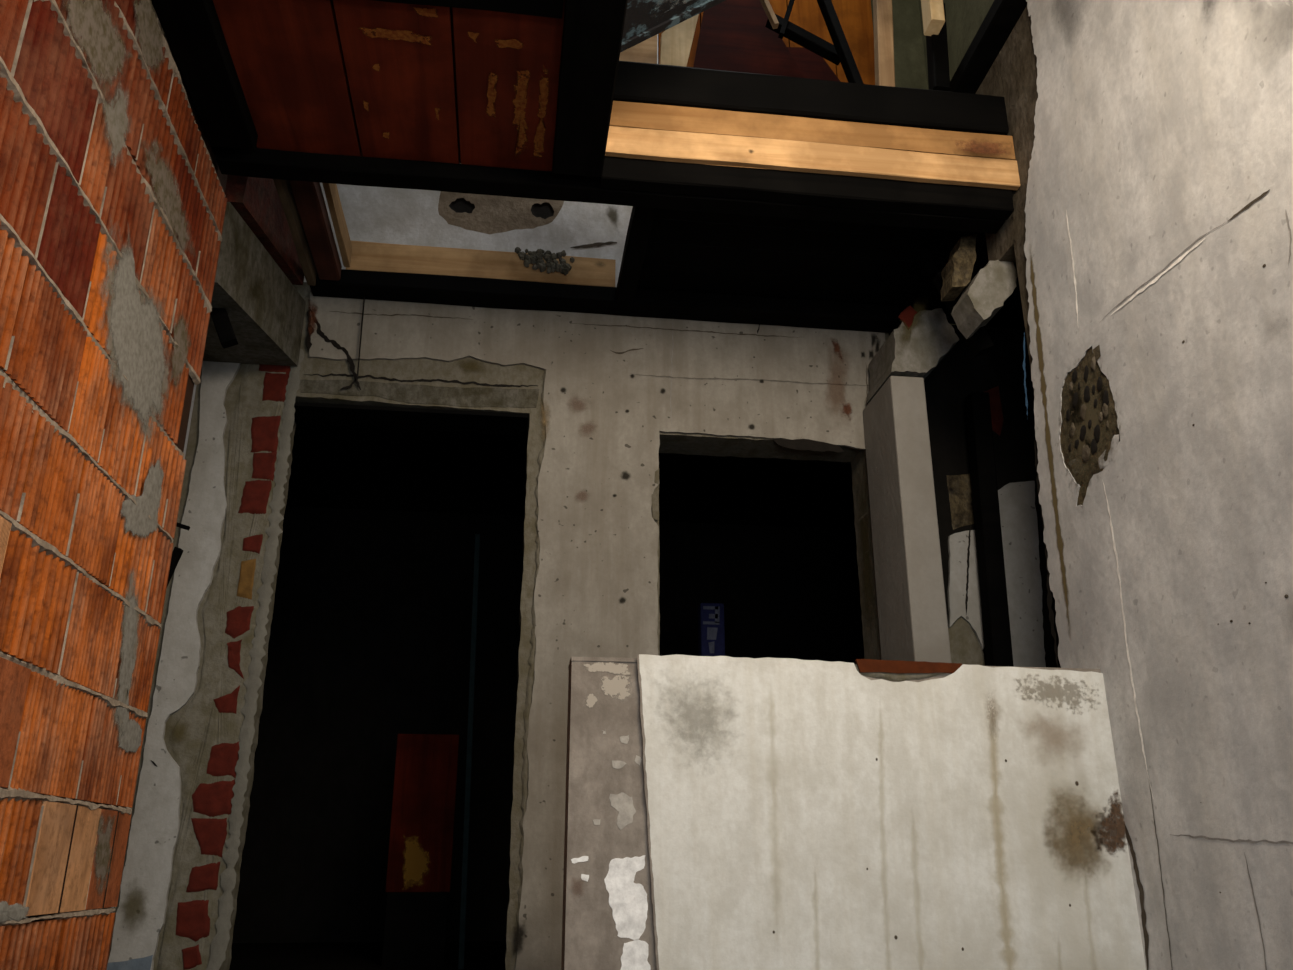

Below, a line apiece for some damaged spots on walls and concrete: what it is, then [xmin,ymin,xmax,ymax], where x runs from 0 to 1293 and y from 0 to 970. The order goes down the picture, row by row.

crack [304,307,538,390]
spalling [1060,345,1120,506]
spalling [516,370,547,927]
peeling [583,662,631,708]
peeling [602,729,642,769]
peeling [609,792,636,830]
corrosion [1091,792,1126,852]
crack [1147,770,1293,970]
peeling [571,855,651,970]